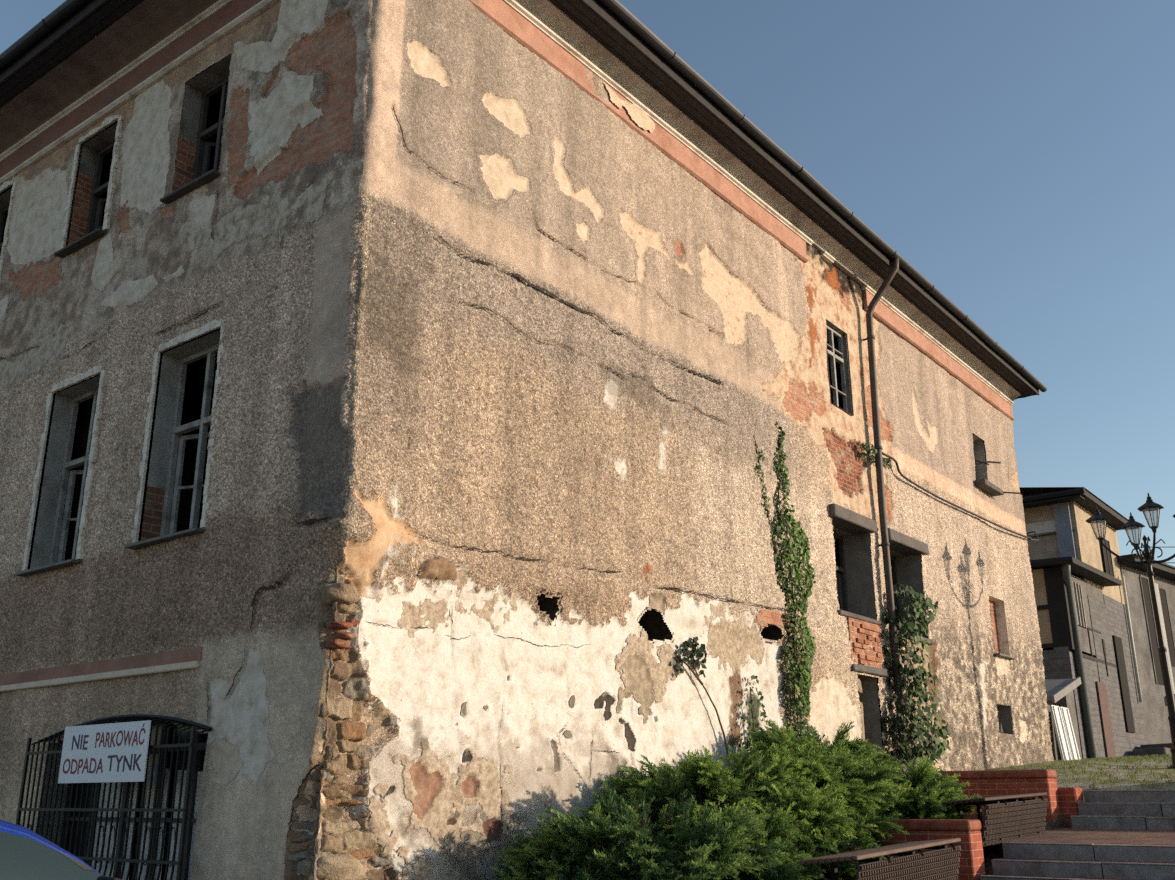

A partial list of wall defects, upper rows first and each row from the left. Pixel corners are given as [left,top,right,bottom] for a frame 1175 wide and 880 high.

flaking render [226,11,358,200]
spalling [407,41,451,88]
spalling [482,92,531,138]
spalling [478,154,530,200]
spalling [553,137,605,243]
flaking render [0,256,63,324]
peeling [91,200,184,308]
crack [438,235,729,424]
crack [534,216,726,339]
flaking render [620,212,894,528]
crack [366,618,588,656]
peeling [284,385,794,880]